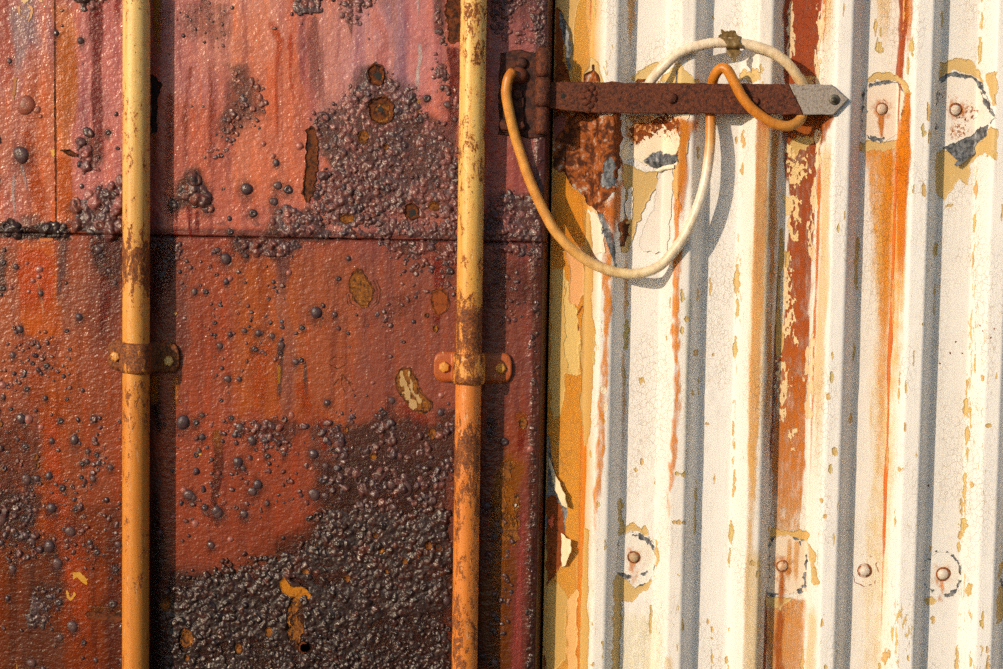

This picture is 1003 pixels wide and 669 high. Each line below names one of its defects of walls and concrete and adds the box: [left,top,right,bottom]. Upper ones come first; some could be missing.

peeling [557,0,604,82]
rust [783,0,831,84]
peeling [859,0,914,152]
peeling [912,0,999,200]
rust [150,0,461,408]
rust [748,114,834,530]
rust [866,0,912,560]
rust [151,376,455,669]
peeling [548,458,567,508]
peeling [546,515,660,669]
rust [763,542,804,669]
peeling [749,526,820,611]